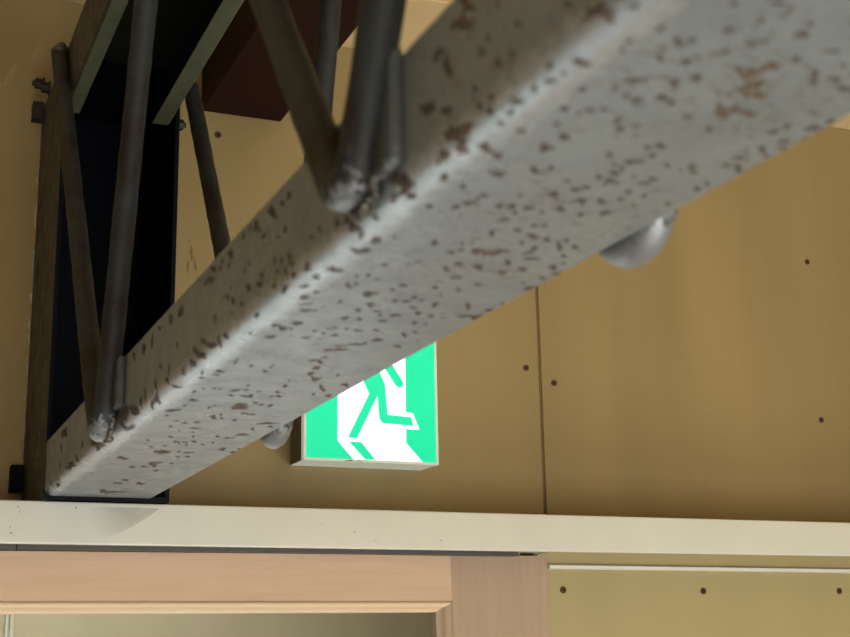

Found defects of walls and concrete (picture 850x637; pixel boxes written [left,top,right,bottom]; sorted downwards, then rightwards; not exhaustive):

corrosion [581,1,615,24]
corrosion [715,62,782,119]
corrosion [436,123,502,181]
corrosion [389,169,417,203]
corrosion [272,253,320,312]
corrosion [335,216,381,254]
corrosion [443,242,511,292]
corrosion [514,224,579,280]
corrosion [301,291,400,397]
corrosion [389,284,443,348]
corrosion [117,332,291,472]
corrosion [59,439,104,470]